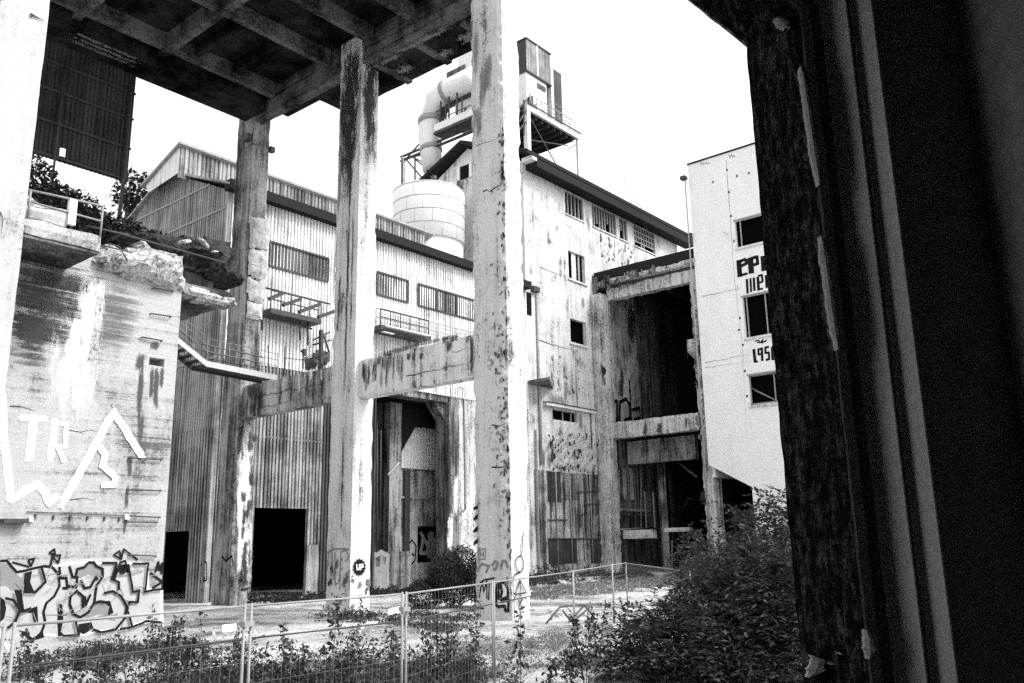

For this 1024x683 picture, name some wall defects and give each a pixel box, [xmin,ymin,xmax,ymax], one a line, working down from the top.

damp [459,32,492,135]
damp [12,267,130,417]
spalling [92,240,237,310]
damp [278,363,326,403]
damp [333,219,353,385]
damp [362,335,473,389]
damp [233,420,259,587]